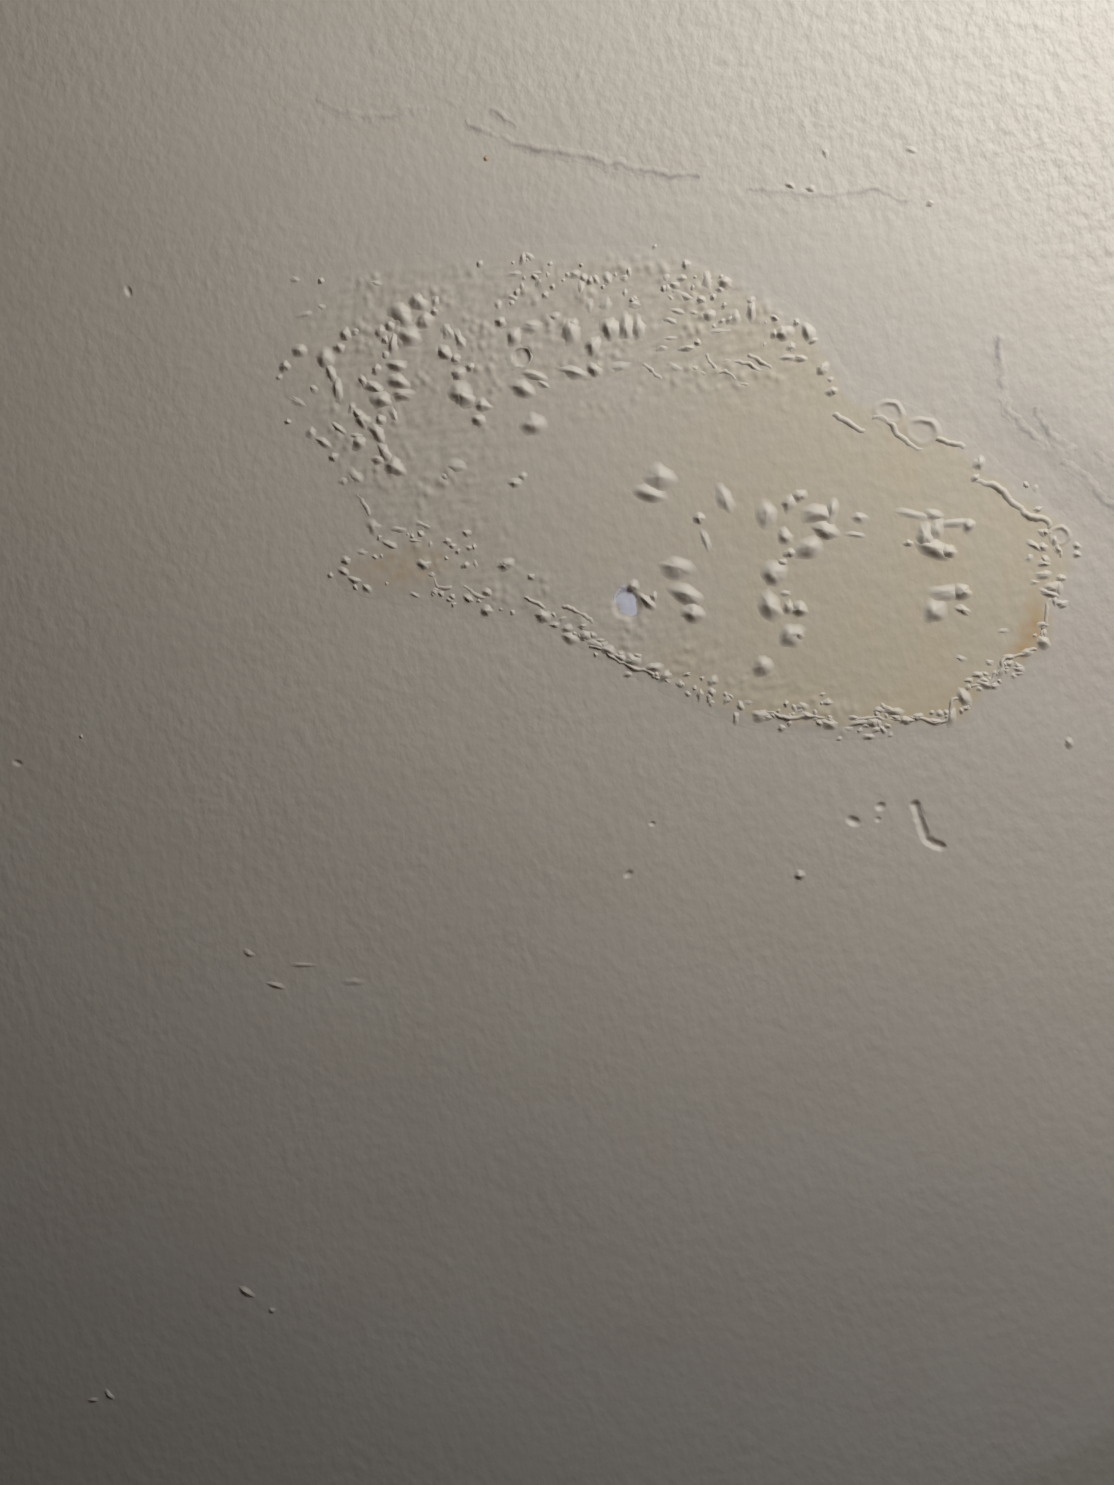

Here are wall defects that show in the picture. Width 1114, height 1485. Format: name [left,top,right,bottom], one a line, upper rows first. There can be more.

crack [463,105,700,184]
crack [746,184,910,206]